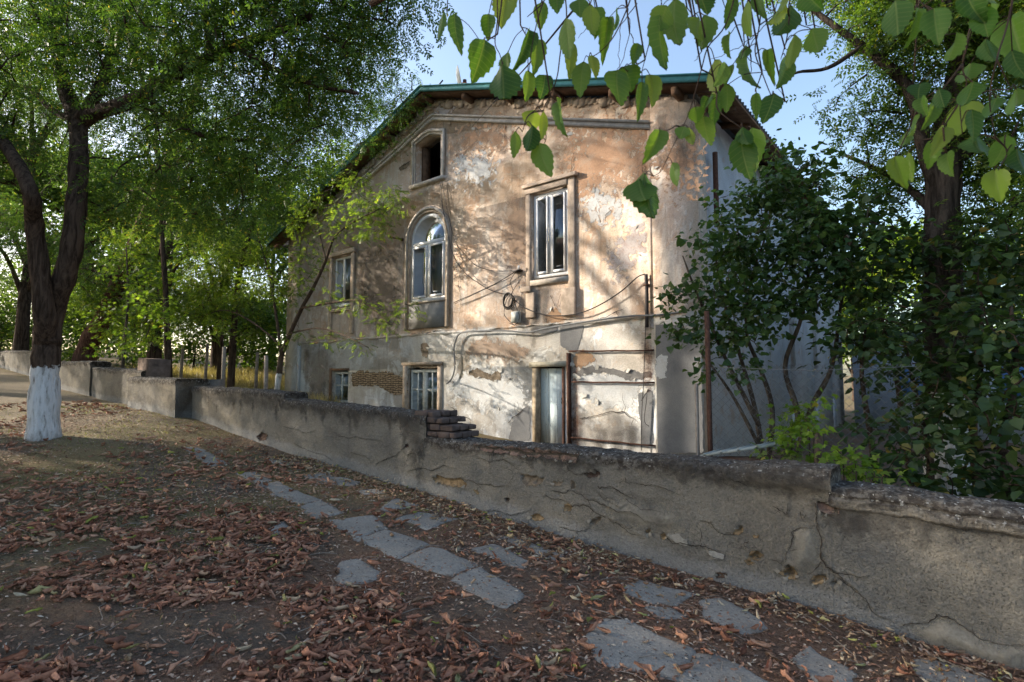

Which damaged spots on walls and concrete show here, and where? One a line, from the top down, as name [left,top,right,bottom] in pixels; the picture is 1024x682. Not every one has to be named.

peeling [449,111,517,197]
peeling [559,104,710,285]
spalling [349,343,443,396]
peeling [446,335,532,416]
peeling [570,349,668,419]
crack [547,462,749,559]
crack [773,503,1005,645]